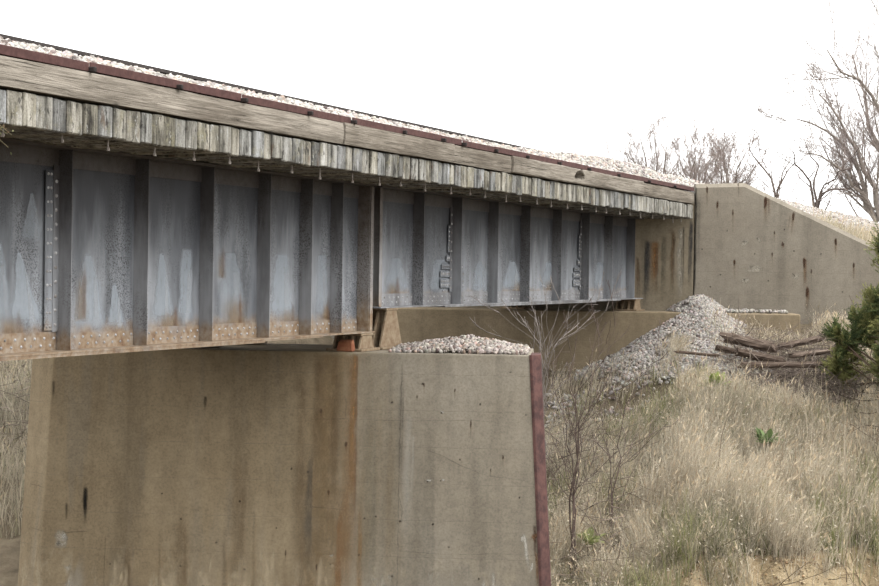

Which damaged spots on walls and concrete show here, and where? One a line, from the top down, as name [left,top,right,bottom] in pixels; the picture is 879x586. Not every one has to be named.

peeling [12,253,39,319]
peeling [78,255,123,322]
peeling [155,250,191,316]
peeling [272,255,292,311]